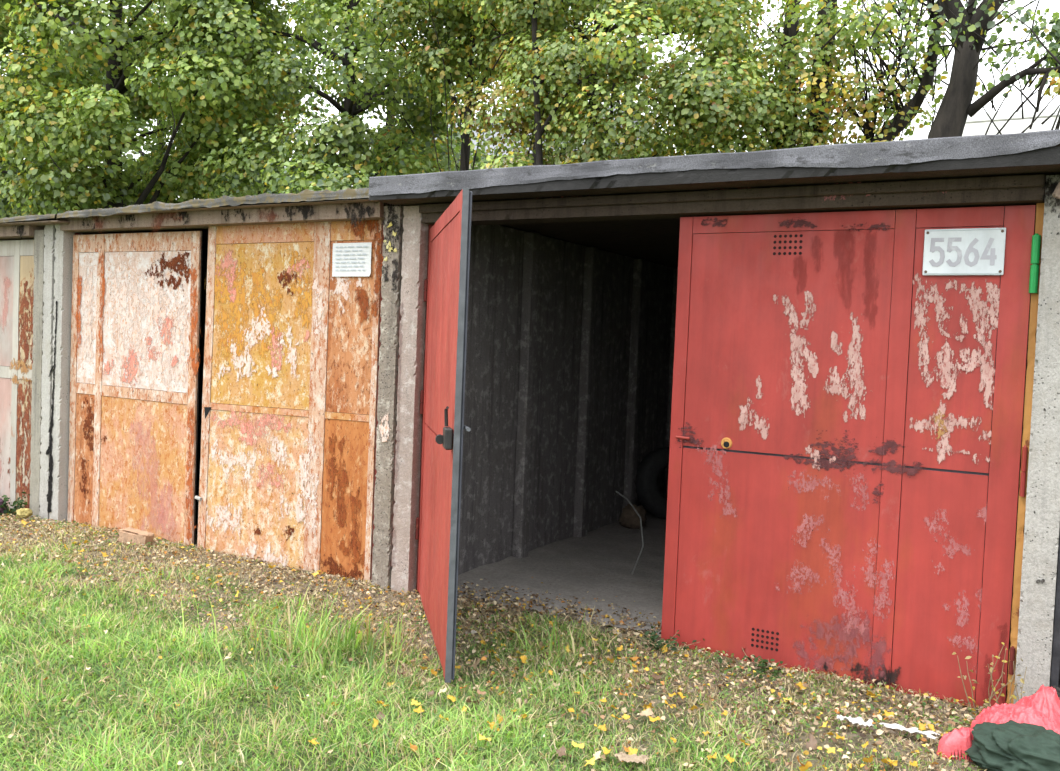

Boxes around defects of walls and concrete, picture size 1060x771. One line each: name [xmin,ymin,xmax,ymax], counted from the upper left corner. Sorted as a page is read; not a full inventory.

corrosion [7,278,35,508]
peeling [81,252,190,392]
corrosion [185,407,196,540]
corrosion [144,251,313,376]
peeling [206,503,291,566]
peeling [210,402,319,534]
peeling [216,257,362,385]
corrosion [320,433,365,580]
peeling [738,375,770,440]
peeling [773,290,872,422]
corrosion [783,430,924,503]
peeling [909,273,1000,464]